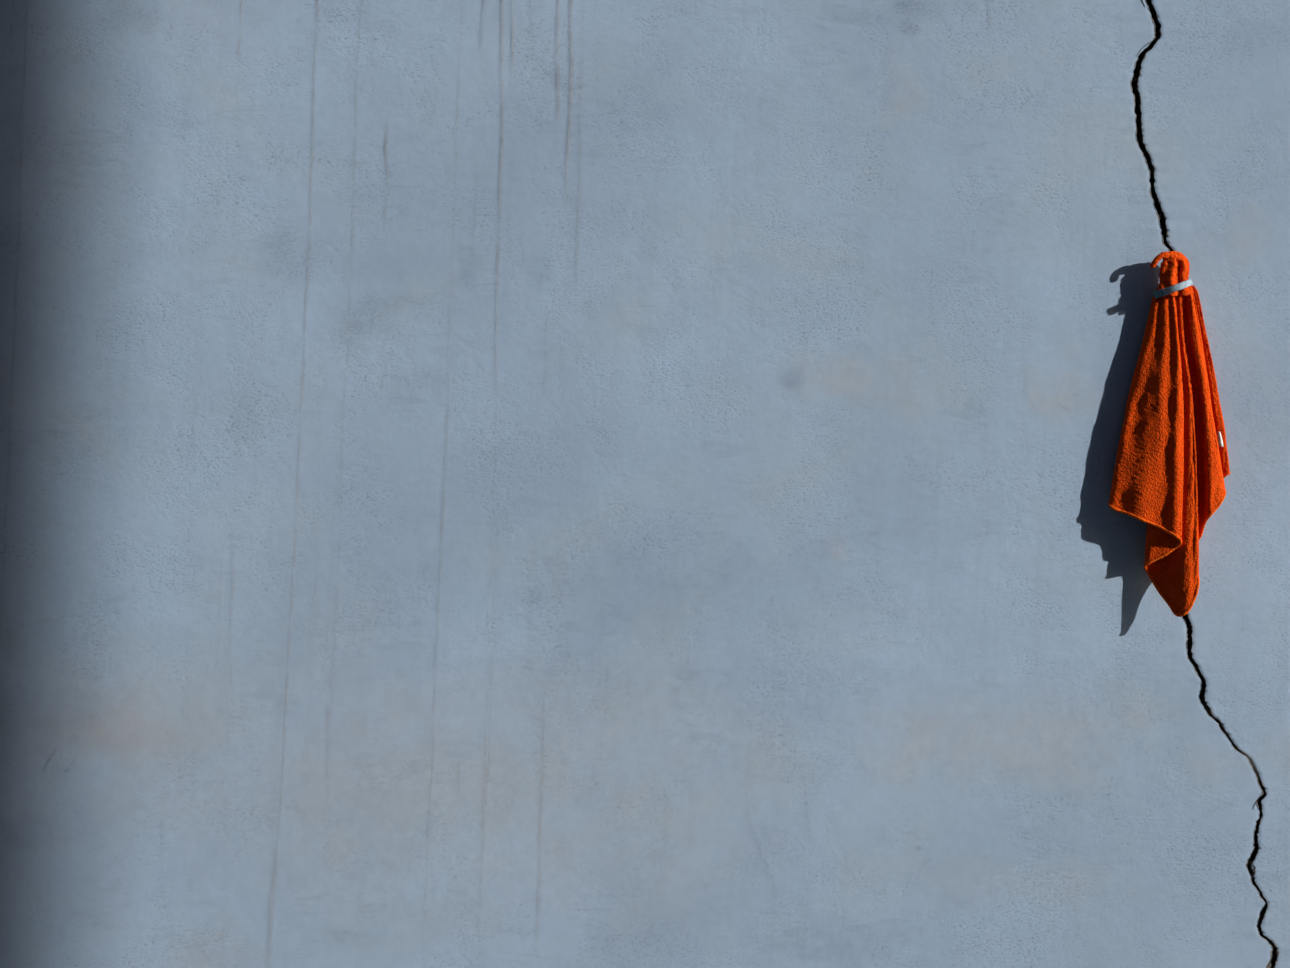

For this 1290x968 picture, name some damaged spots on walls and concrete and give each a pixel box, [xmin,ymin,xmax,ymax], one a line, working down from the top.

crack [1130,0,1174,251]
crack [1182,613,1279,968]